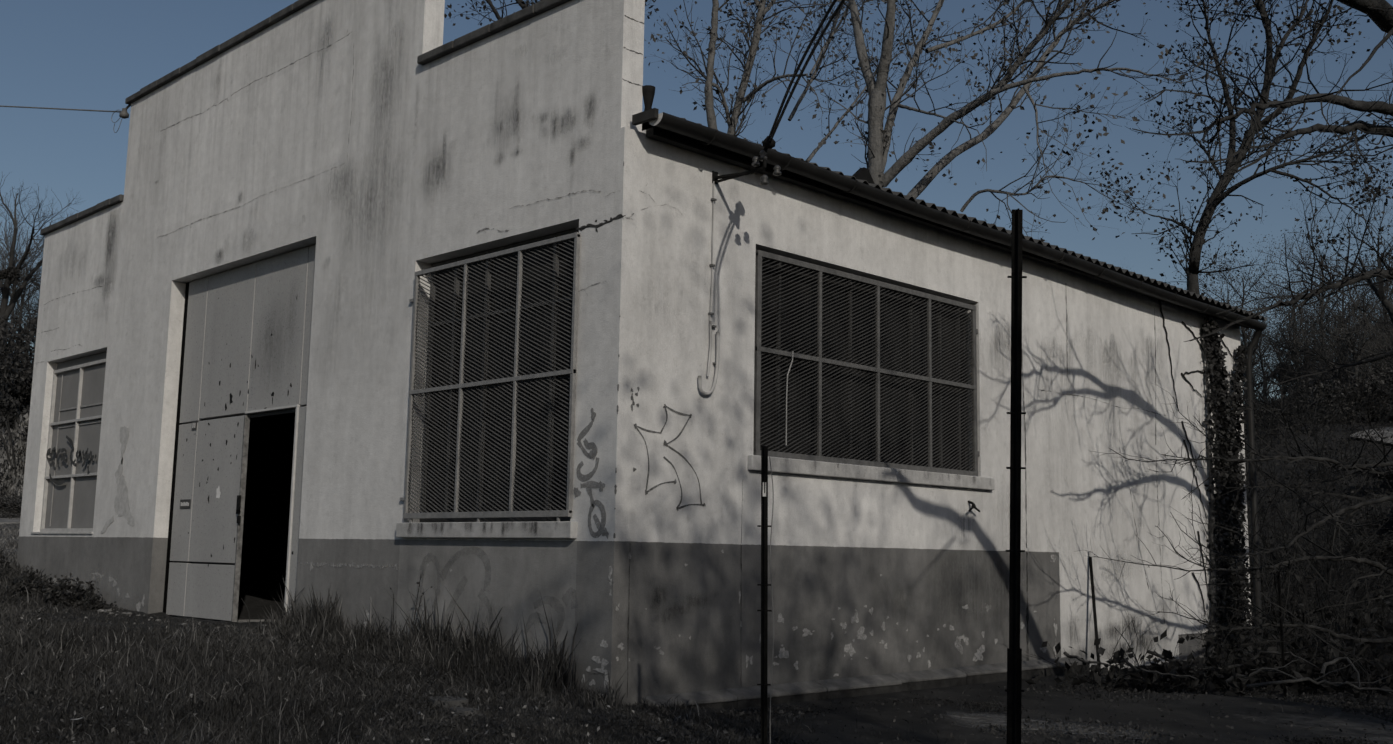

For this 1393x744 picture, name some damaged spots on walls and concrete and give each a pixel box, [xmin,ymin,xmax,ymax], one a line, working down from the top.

crack [477,190,644,233]
peeling [831,605,998,667]
peeling [581,640,630,695]